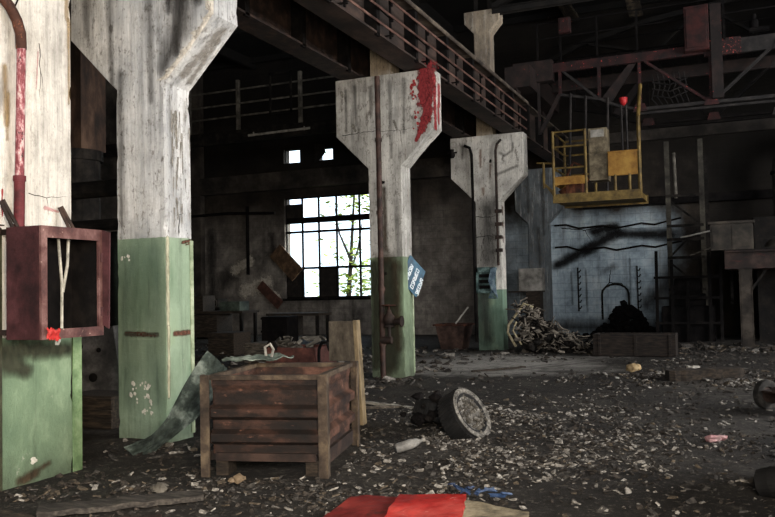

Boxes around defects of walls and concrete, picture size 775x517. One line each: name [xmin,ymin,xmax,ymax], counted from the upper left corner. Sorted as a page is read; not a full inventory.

peeling [129,381,153,415]